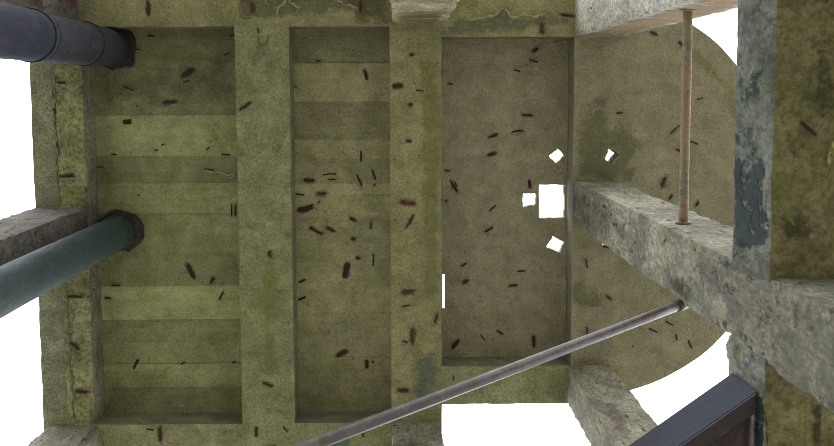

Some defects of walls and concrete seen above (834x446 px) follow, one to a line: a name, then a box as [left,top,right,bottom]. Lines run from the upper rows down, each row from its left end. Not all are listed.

crack [52,66,61,193]